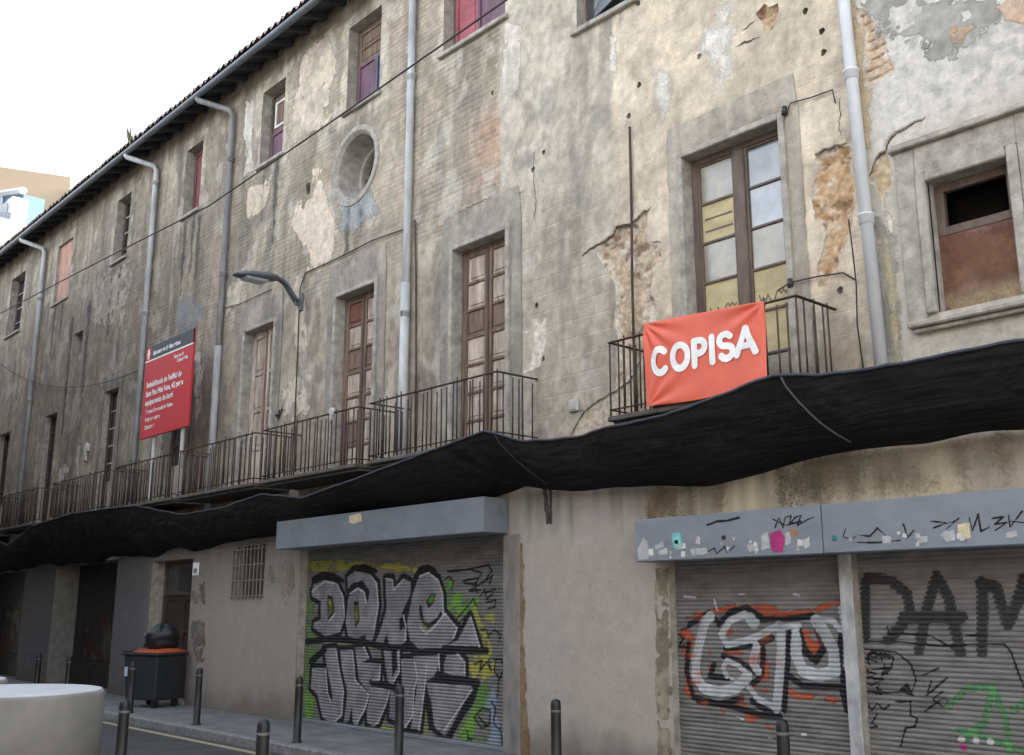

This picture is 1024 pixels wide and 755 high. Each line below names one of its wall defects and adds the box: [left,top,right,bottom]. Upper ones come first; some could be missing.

spalling [735,3,779,47]
flaking render [855,8,895,90]
flaking render [995,0,1024,24]
flaking render [243,98,271,219]
crack [812,99,927,176]
flaking render [812,146,856,294]
flaking render [280,168,335,423]
flaking render [574,212,662,436]